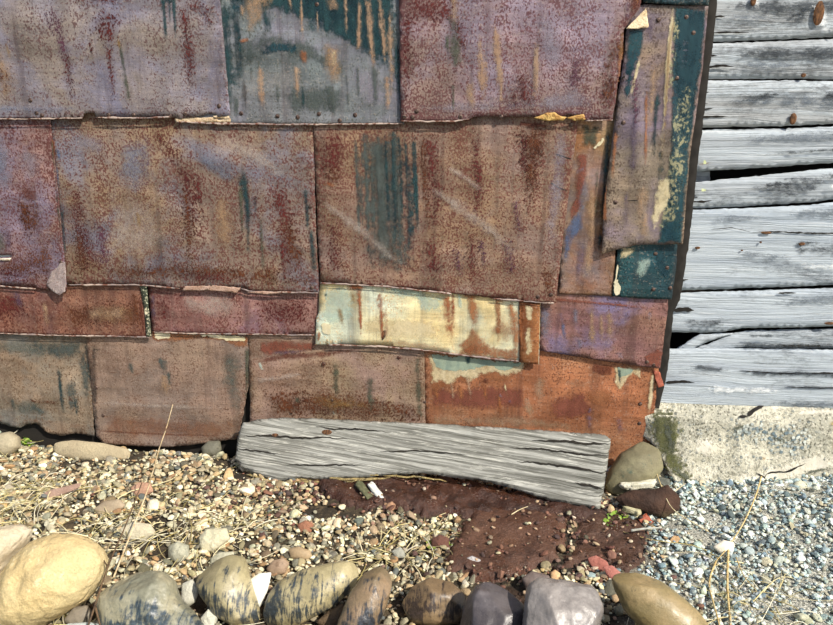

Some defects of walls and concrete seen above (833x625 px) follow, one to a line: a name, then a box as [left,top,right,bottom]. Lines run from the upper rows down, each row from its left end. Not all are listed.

corrosion [44,6,75,93]
corrosion [75,0,122,101]
corrosion [179,0,214,95]
corrosion [357,0,468,99]
peeling [626,9,649,29]
corrosion [0,189,56,281]
corrosion [69,133,309,285]
corrosion [418,131,488,284]
corrosion [502,122,549,274]
corrosion [444,295,455,331]
corrosion [461,295,532,359]
corrosion [434,379,545,425]